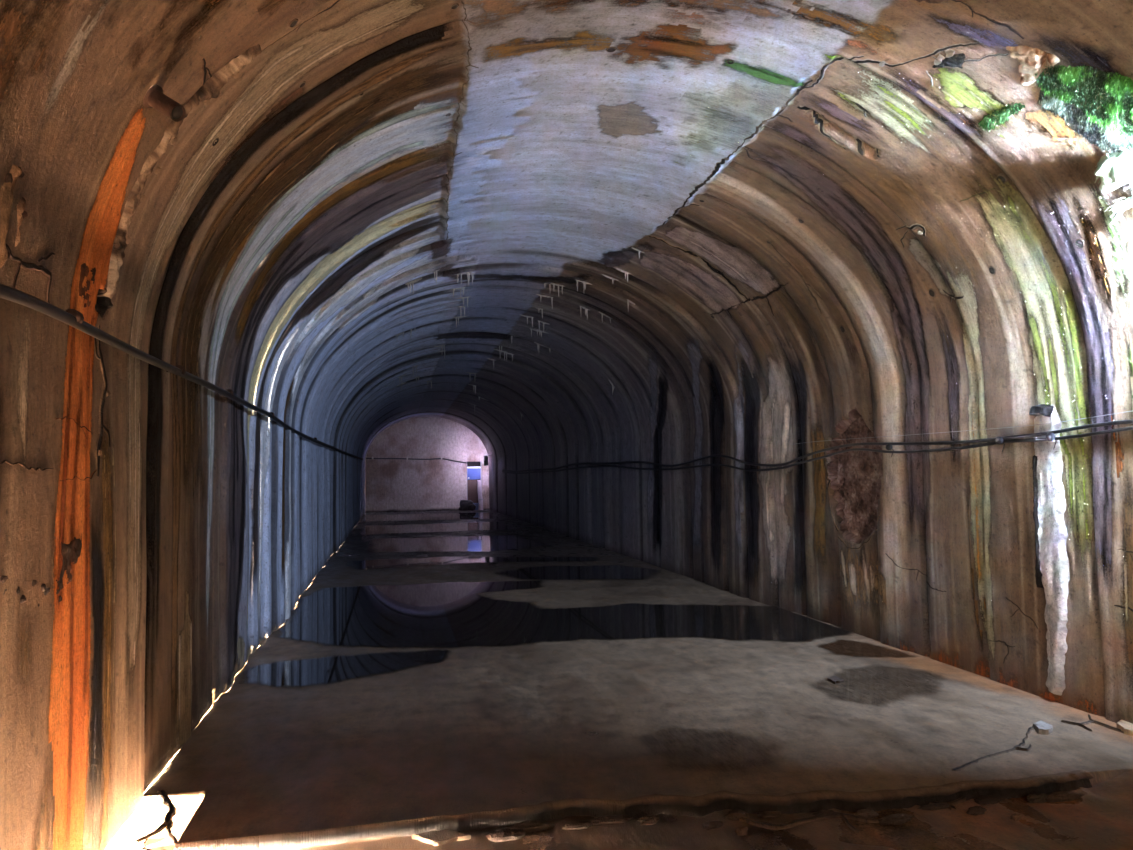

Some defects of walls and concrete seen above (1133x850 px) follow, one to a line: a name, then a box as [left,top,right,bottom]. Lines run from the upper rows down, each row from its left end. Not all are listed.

flaking render [0,164,28,268]
crack [5,243,55,304]
spalling [84,44,261,318]
crack [445,0,479,257]
leakage [483,0,898,69]
crack [648,0,1024,317]
rust [49,108,146,850]
leakage [88,0,780,850]
spalling [827,407,883,544]
leakage [1006,182,1133,687]